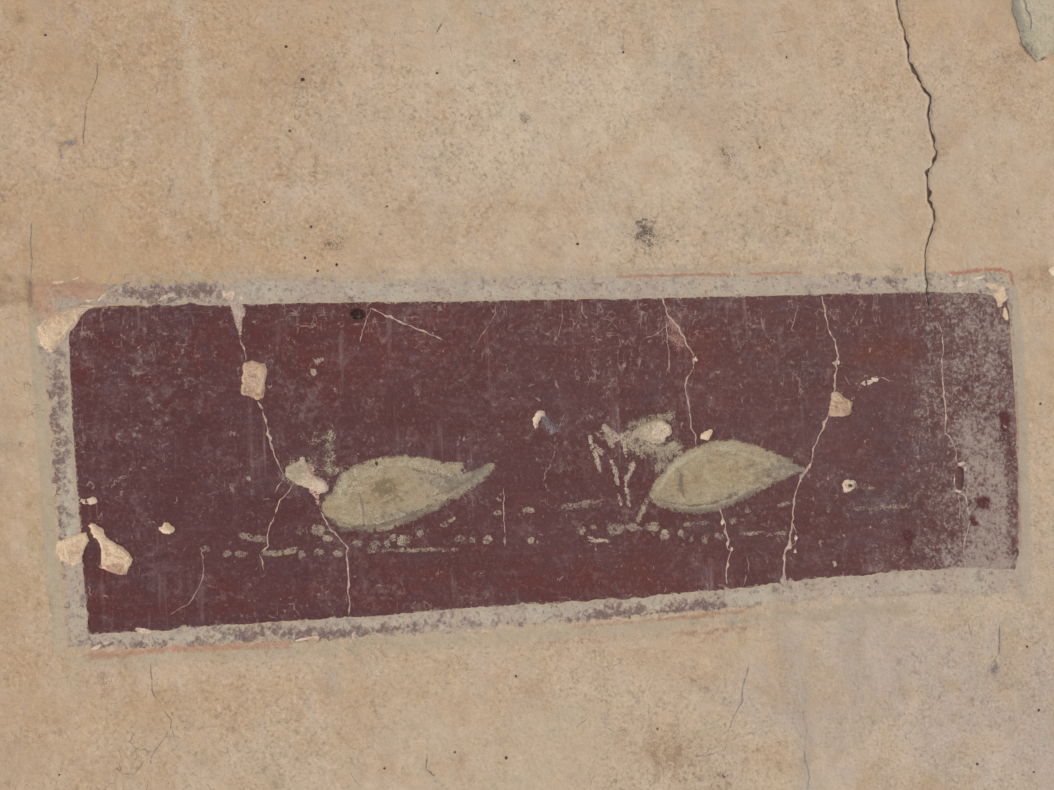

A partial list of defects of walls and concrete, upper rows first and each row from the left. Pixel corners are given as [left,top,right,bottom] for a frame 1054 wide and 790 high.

crack [896,0,957,462]
spalling [25,277,114,352]
spalling [240,361,267,400]
crack [613,299,697,444]
spalling [829,375,893,417]
crack [258,402,293,570]
spalling [278,429,348,504]
crack [780,299,861,588]
spalling [55,521,132,575]
crack [319,507,357,613]
crack [958,493,970,567]